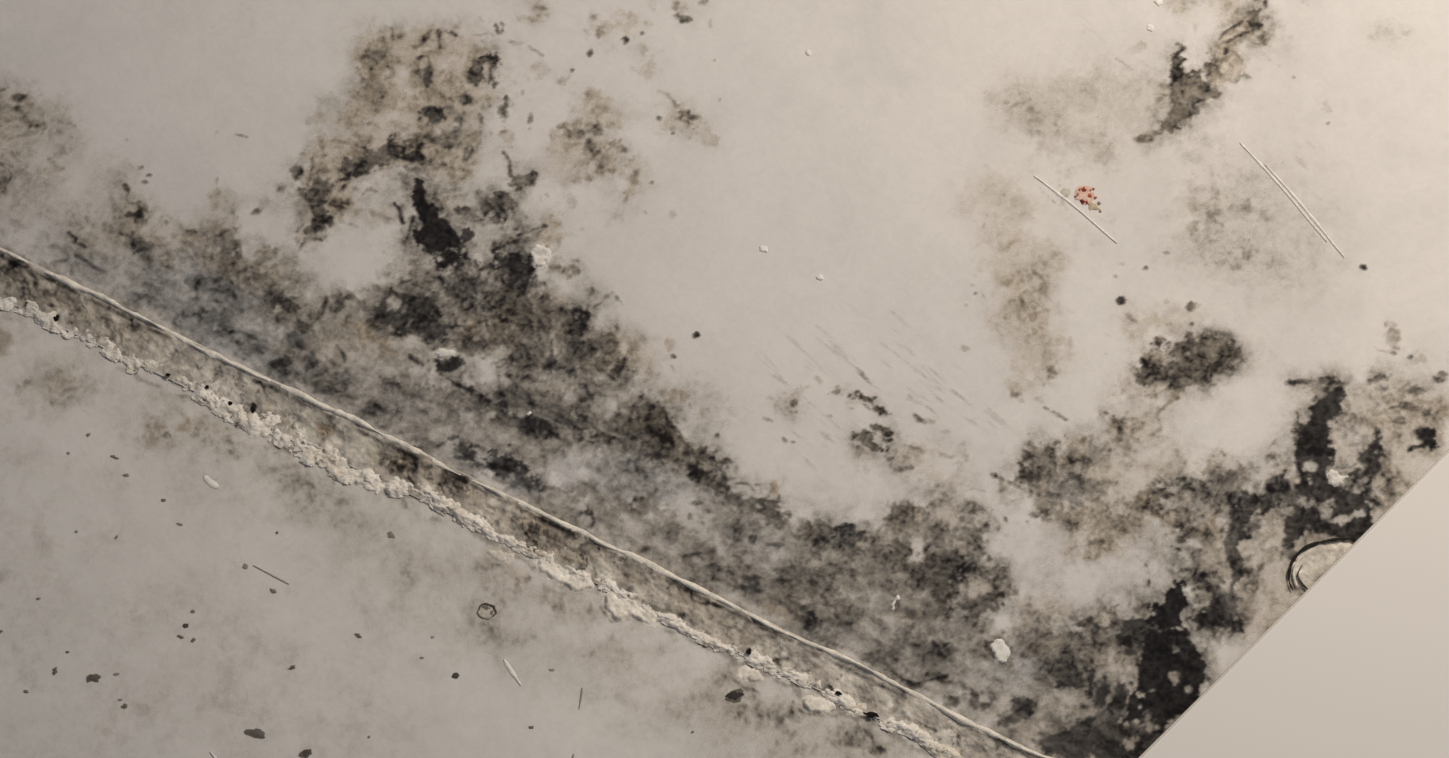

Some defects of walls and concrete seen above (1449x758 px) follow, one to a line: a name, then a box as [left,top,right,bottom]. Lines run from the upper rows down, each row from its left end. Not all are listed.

water stain [527,0,549,23]
water stain [586,14,647,57]
water stain [672,0,709,24]
water stain [991,76,1113,164]
water stain [1187,172,1287,279]
water stain [0,22,757,612]
water stain [995,232,1062,385]
water stain [1116,296,1138,338]
water stain [1185,300,1198,312]
water stain [117,367,641,669]
water stain [734,321,1449,758]
water stain [658,628,930,758]